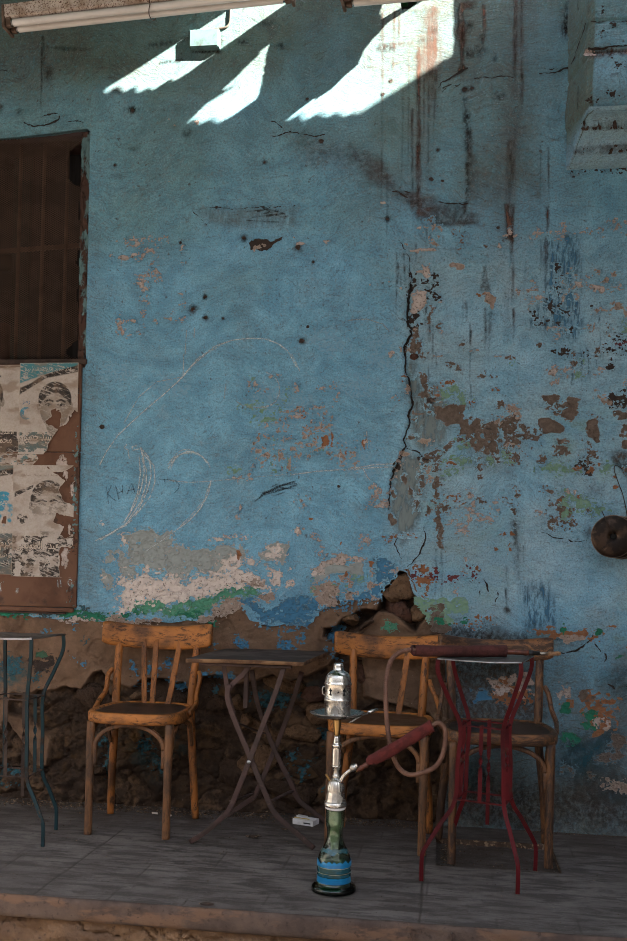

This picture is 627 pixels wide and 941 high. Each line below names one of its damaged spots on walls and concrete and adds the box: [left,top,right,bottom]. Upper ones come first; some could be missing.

rust [405,8,436,217]
rust [457,2,486,71]
crack [438,67,514,90]
crack [539,21,627,74]
rust [505,205,514,247]
crack [388,243,423,510]
spalling [0,215,627,822]
crack [394,527,426,571]